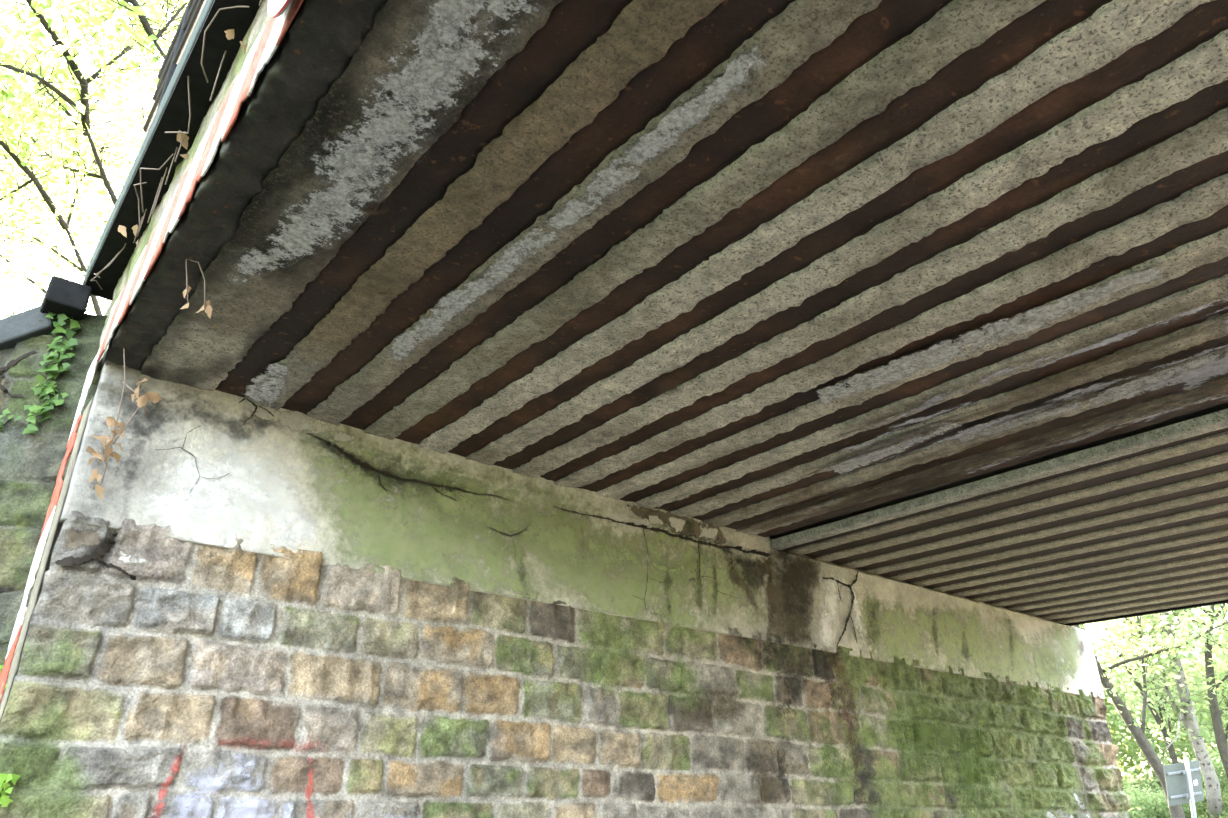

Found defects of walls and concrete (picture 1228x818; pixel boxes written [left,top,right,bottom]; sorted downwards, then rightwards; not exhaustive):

damp [227,0,540,283]
damp [381,46,766,362]
damp [244,363,289,407]
damp [817,267,1165,404]
damp [775,297,1228,516]
crack [307,433,511,501]
crack [55,531,136,580]
crack [488,506,771,613]
damp [723,548,861,709]
crack [822,571,859,647]
damp [754,739,793,806]
damp [856,747,879,806]